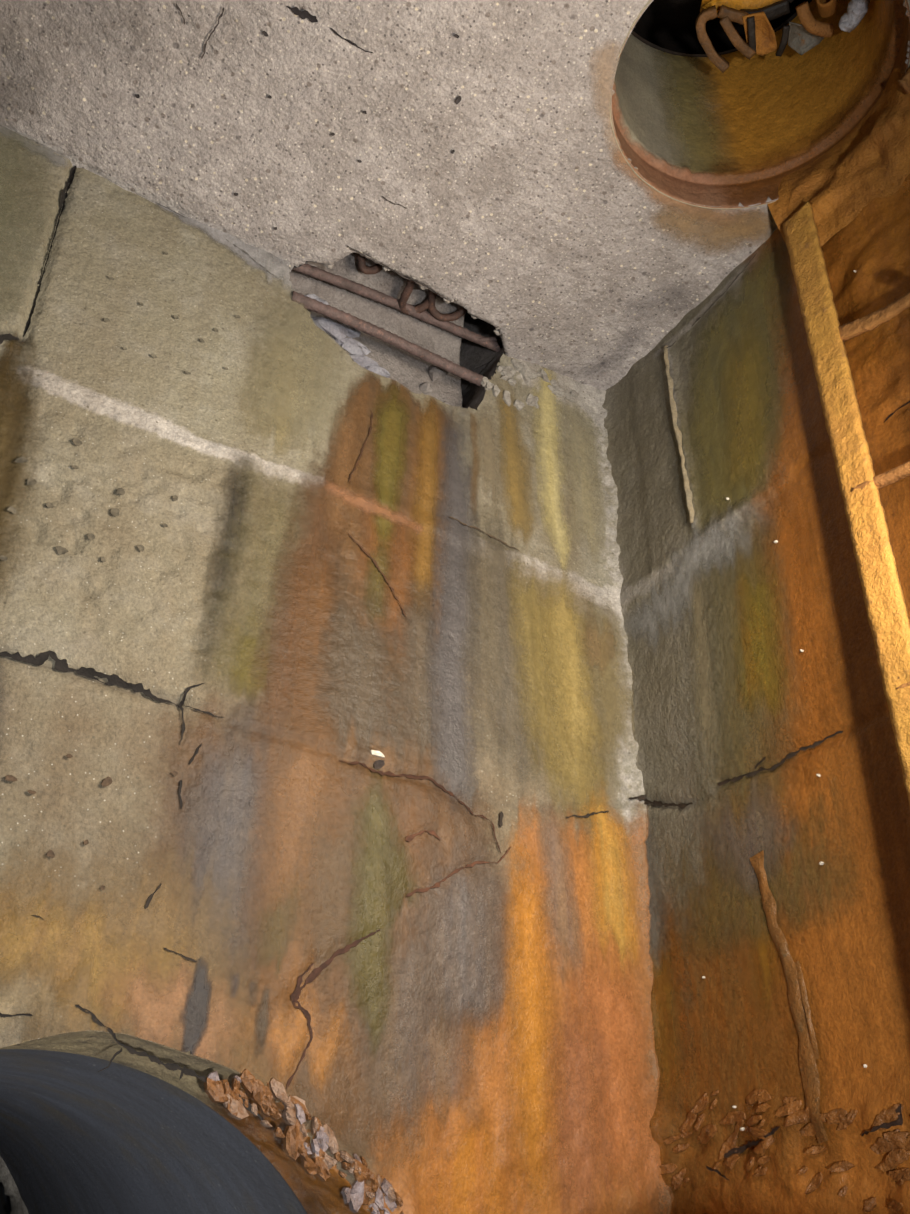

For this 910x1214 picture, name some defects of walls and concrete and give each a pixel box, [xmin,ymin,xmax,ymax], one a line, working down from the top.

crack [0,166,77,344]
spalling [289,252,579,411]
leakage [0,340,29,566]
corrosion [215,0,910,1214]
crack [0,650,224,809]
crack [339,760,512,897]
crack [566,795,693,818]
crack [75,1004,263,1120]
flaking render [204,1069,404,1214]
crack [286,930,380,1089]
spalling [659,1089,857,1197]
spalling [870,1104,910,1185]